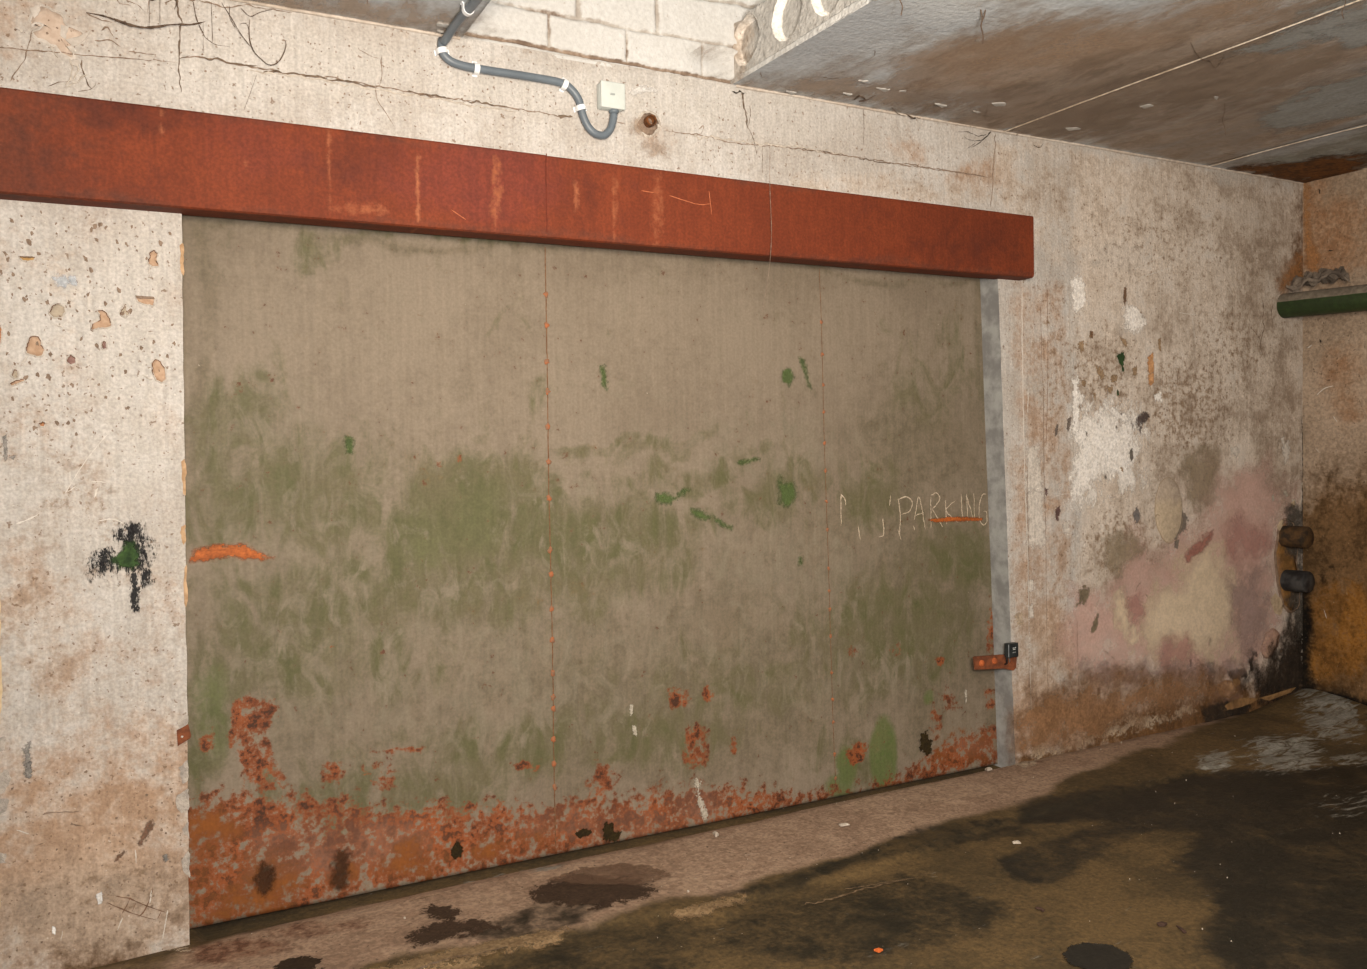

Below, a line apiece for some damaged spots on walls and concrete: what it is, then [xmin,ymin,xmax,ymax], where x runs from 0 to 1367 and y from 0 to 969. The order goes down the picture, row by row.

water stain [261,0,466,35]
water stain [790,0,1367,140]